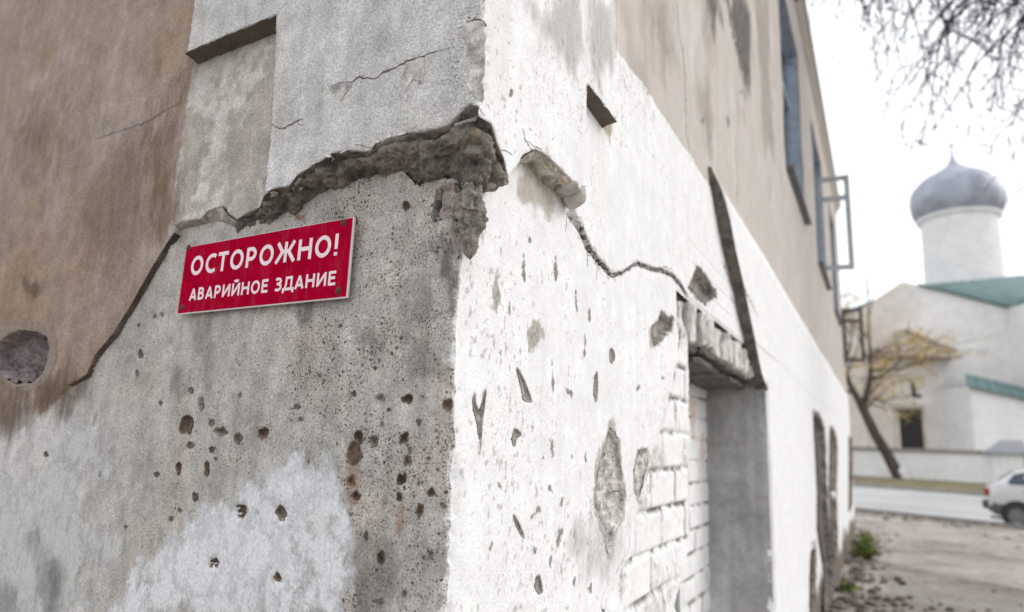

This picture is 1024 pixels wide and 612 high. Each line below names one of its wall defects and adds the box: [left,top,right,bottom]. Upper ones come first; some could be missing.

crack [334,19,487,85]
spalling [69,21,511,386]
crack [565,216,688,295]
spalling [687,265,717,306]
spalling [708,167,768,391]
hole [0,318,57,396]
spalling [571,310,690,612]